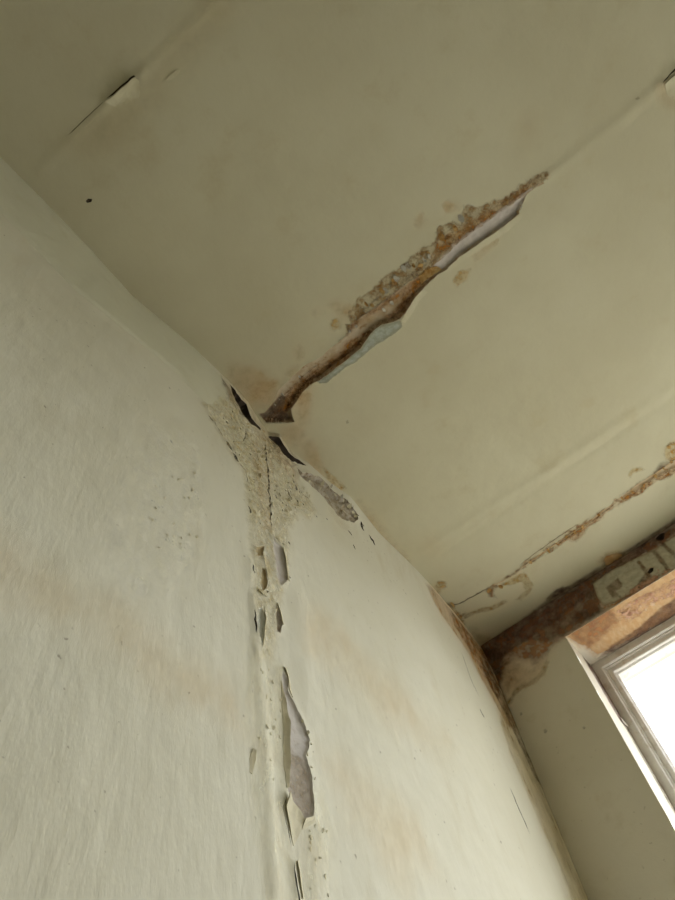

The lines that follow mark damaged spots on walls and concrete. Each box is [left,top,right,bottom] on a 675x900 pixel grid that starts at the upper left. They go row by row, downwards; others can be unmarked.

flaking render [259,173,548,423]
crack [226,385,306,530]
flaking render [209,405,375,646]
peeling [250,667,328,861]